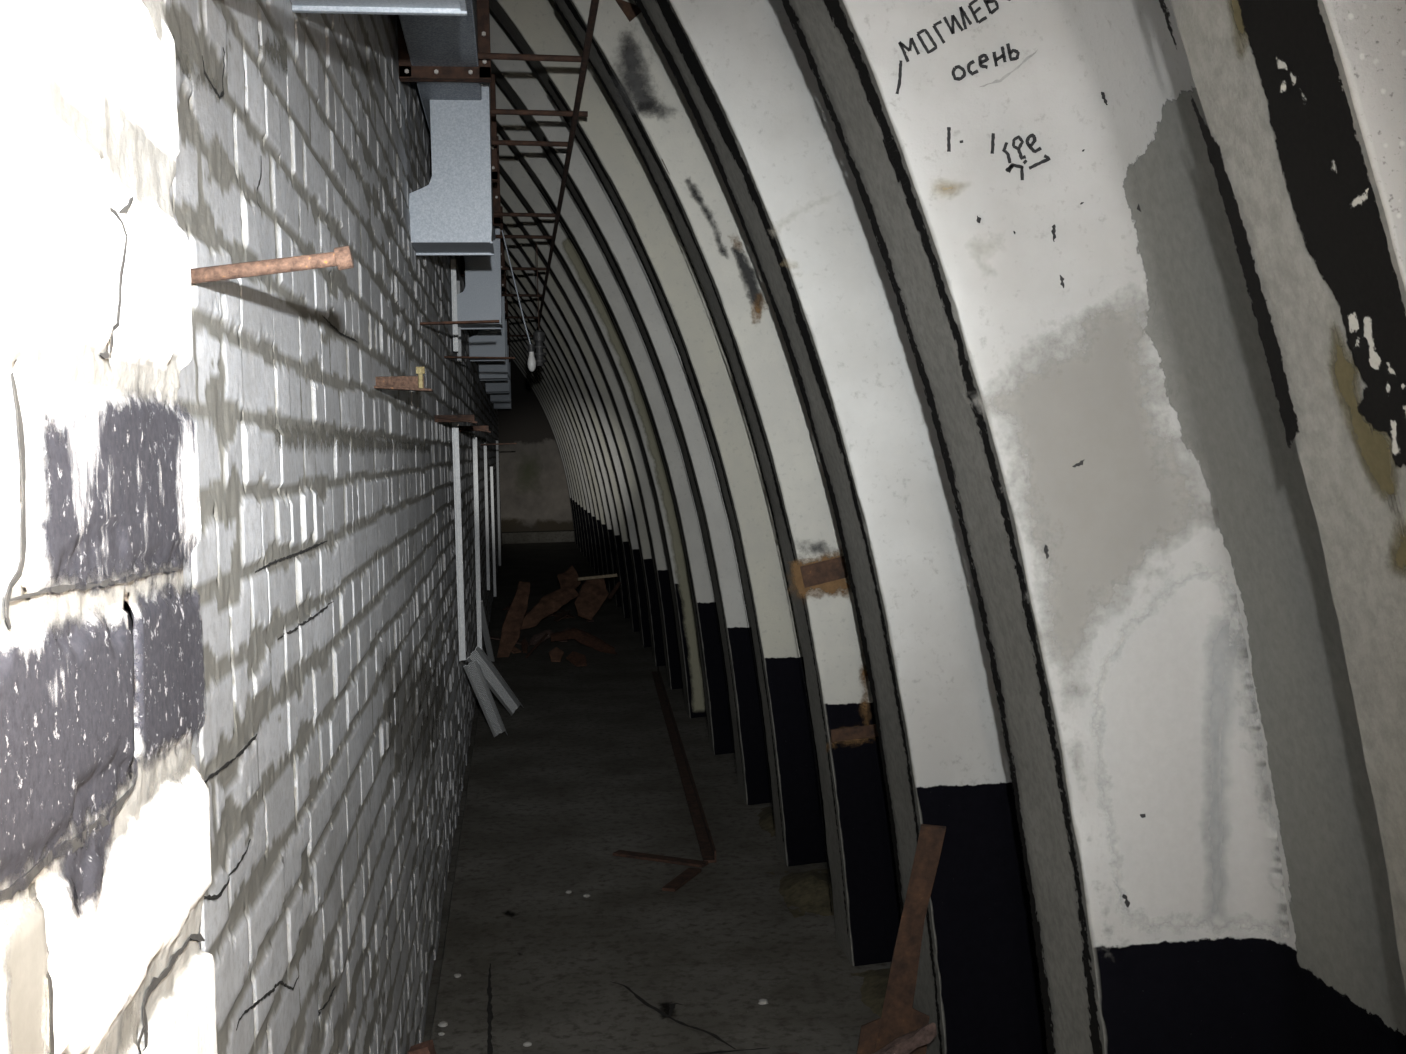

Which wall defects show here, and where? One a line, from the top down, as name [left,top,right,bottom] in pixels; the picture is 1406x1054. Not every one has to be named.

peeling [1159,0,1177,50]
crack [99,197,134,359]
peeling [1237,0,1406,467]
peeling [1123,88,1406,1036]
crack [204,734,257,784]
crack [204,839,251,900]